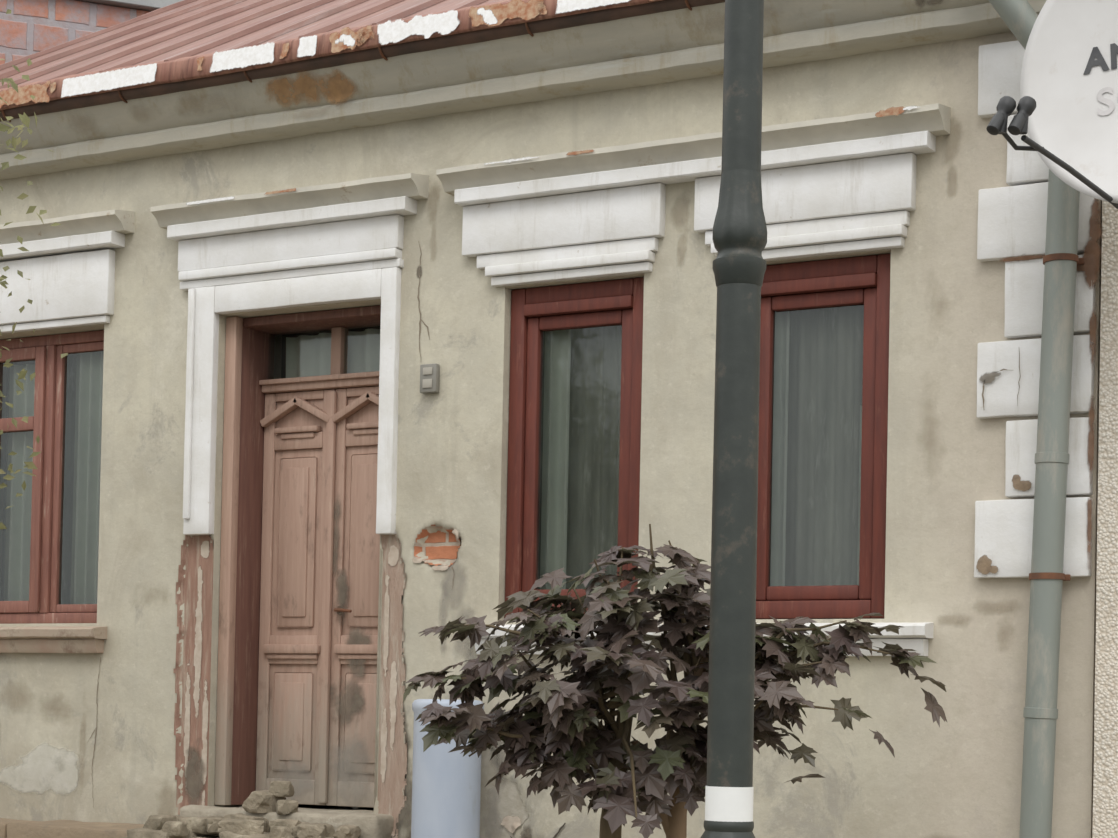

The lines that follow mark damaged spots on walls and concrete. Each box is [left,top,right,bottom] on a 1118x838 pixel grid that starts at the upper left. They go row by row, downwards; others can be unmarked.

corrosion [268,71,355,104]
crack [417,241,430,357]
spalling [980,351,1021,408]
spalling [1012,475,1031,491]
spalling [976,555,998,574]
crack [87,659,101,808]
peeling [173,535,214,815]
peeling [377,525,461,838]